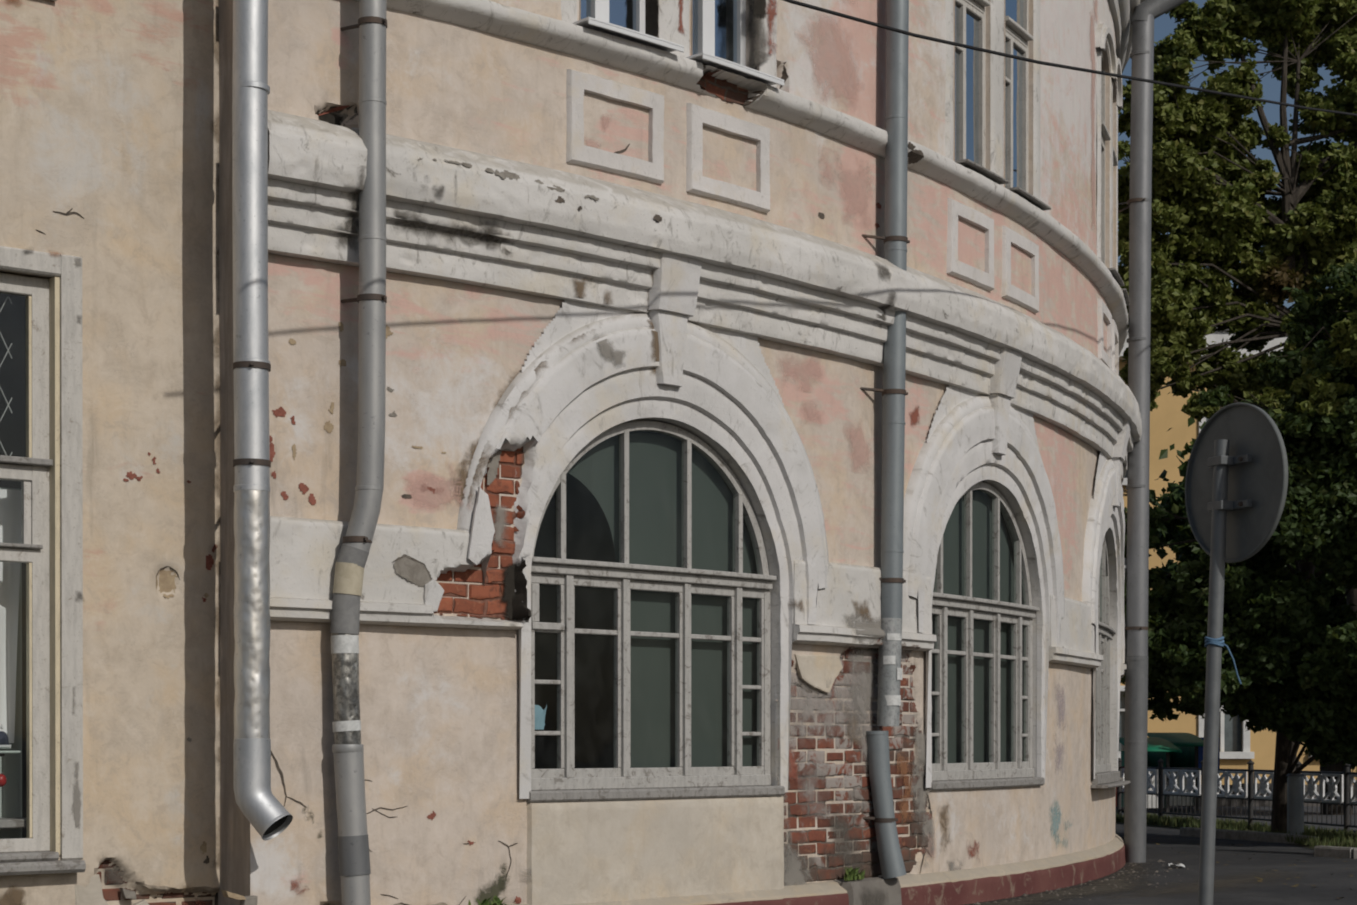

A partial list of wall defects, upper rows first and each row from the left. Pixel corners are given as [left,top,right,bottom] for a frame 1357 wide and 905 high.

spalling [697,62,789,106]
hole [315,104,358,126]
water stain [396,210,511,254]
peeling [272,407,295,424]
spalling [324,402,334,433]
peeling [269,435,316,505]
flaking render [393,443,531,622]
spalling [156,566,180,599]
crack [271,751,306,807]
flaking render [775,637,949,886]
spalling [75,860,219,905]